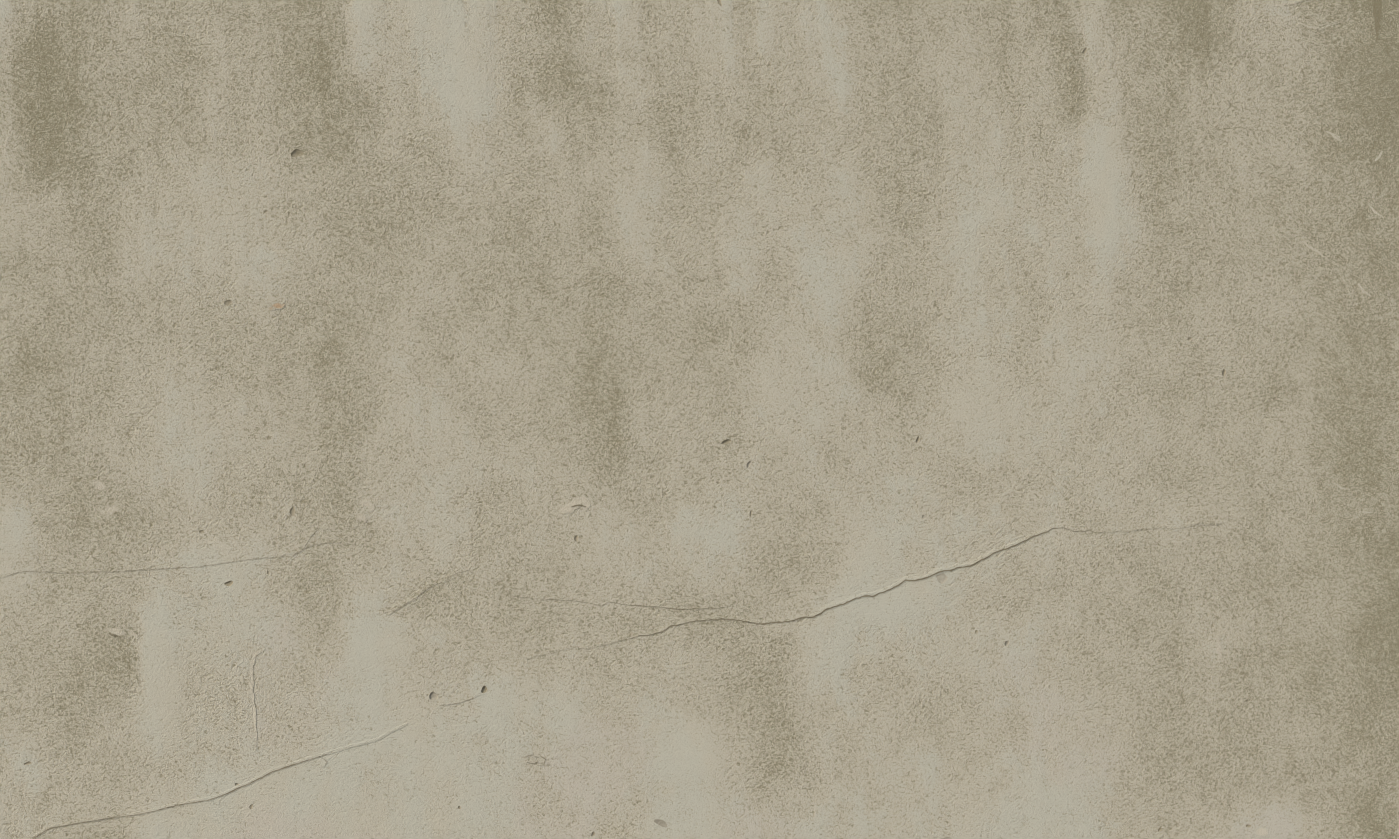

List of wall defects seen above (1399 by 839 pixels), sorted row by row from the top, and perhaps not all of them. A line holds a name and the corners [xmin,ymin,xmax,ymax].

crack [0,520,1221,660]
crack [28,722,408,839]